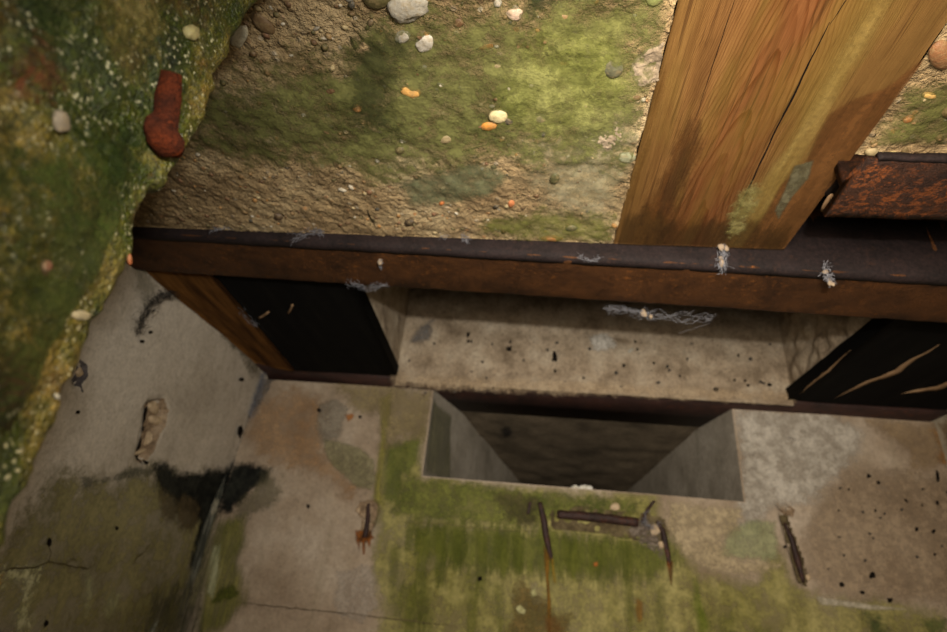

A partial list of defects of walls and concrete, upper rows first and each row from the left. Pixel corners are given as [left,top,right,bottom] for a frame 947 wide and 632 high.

crack [731,0,846,224]
damp [0,563,42,632]
spalling [135,398,169,464]
rust [356,530,374,554]
damp [103,376,788,632]
damp [667,410,947,610]